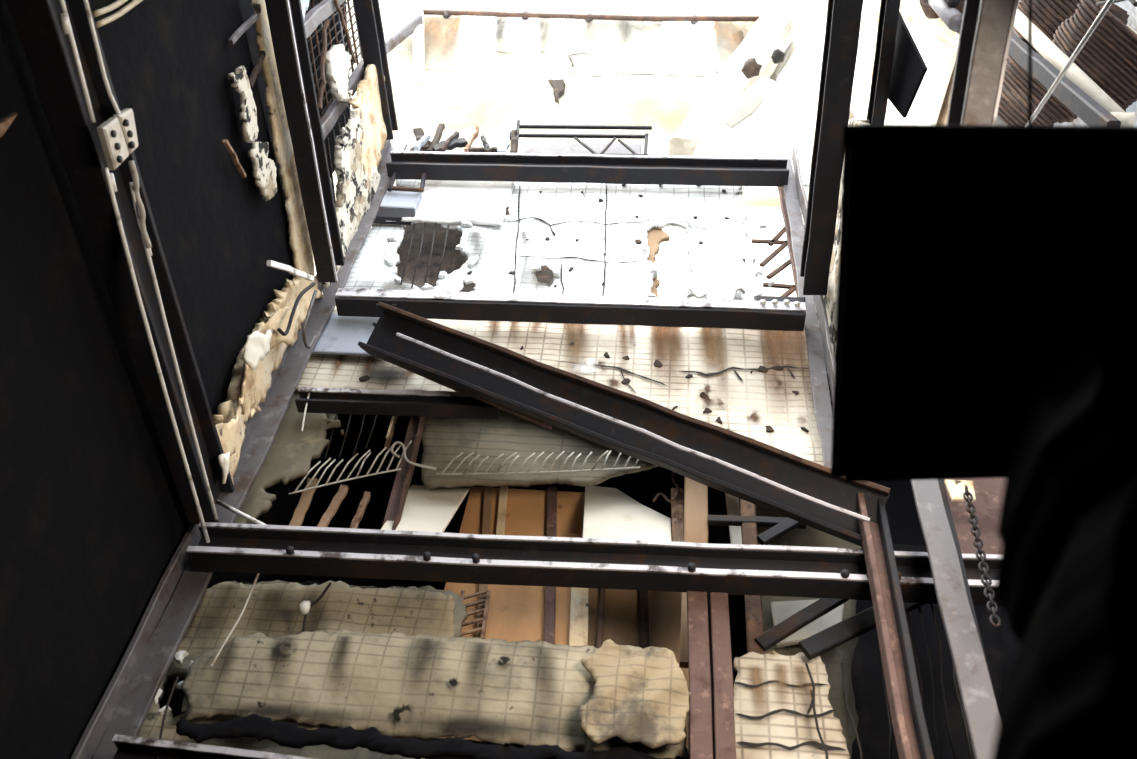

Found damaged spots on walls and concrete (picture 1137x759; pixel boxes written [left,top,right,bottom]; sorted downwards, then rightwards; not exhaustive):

peeling [421,271,448,291]
spalling [456,243,479,292]
corrosion [566,324,583,356]
corrosion [620,325,634,351]
corrosion [653,326,678,361]
corrosion [701,328,721,365]
corrosion [763,330,805,386]
water stain [337,636,349,664]
water stain [473,643,485,671]
water stain [537,647,552,687]
water stain [243,705,343,718]
water stain [438,717,512,734]